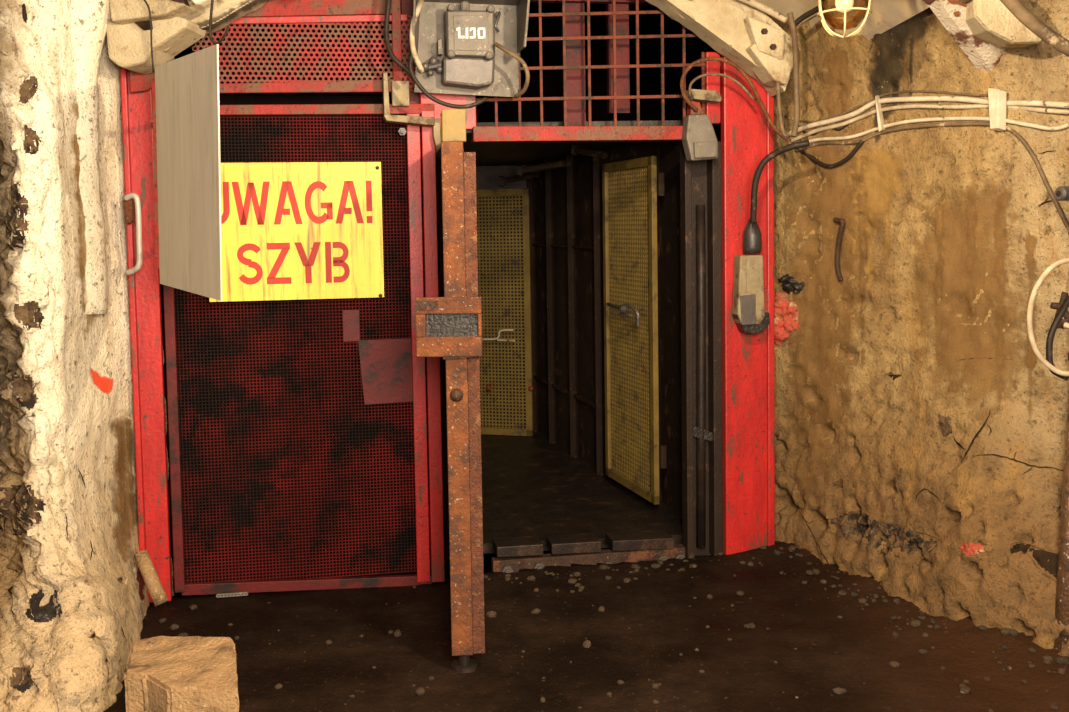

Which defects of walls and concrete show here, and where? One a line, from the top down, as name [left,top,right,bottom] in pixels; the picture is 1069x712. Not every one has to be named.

crack [952,409,1063,474]